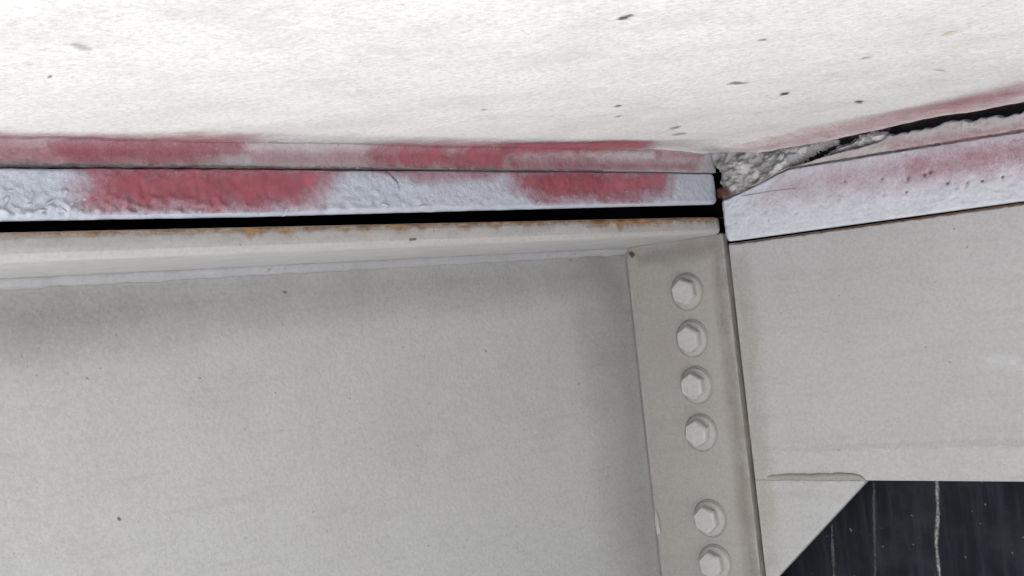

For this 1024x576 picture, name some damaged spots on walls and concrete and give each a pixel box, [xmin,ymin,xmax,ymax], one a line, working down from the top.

spalling [710,139,841,201]